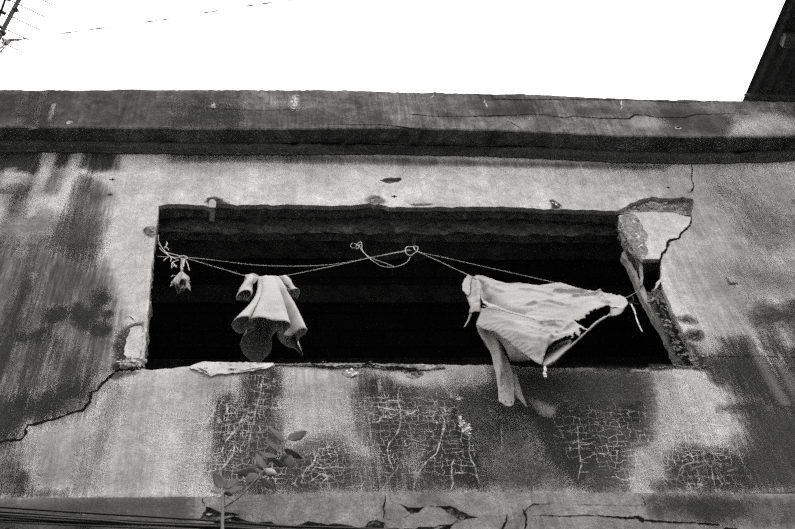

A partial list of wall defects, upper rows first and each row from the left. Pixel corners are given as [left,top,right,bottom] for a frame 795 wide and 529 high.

crack [288,97,565,148]
crack [484,98,735,127]
spalling [618,201,693,259]
spalling [112,323,147,370]
spalling [595,289,707,377]
crack [0,366,145,443]
crack [137,362,478,506]
crack [501,406,741,529]
spalling [444,508,470,521]